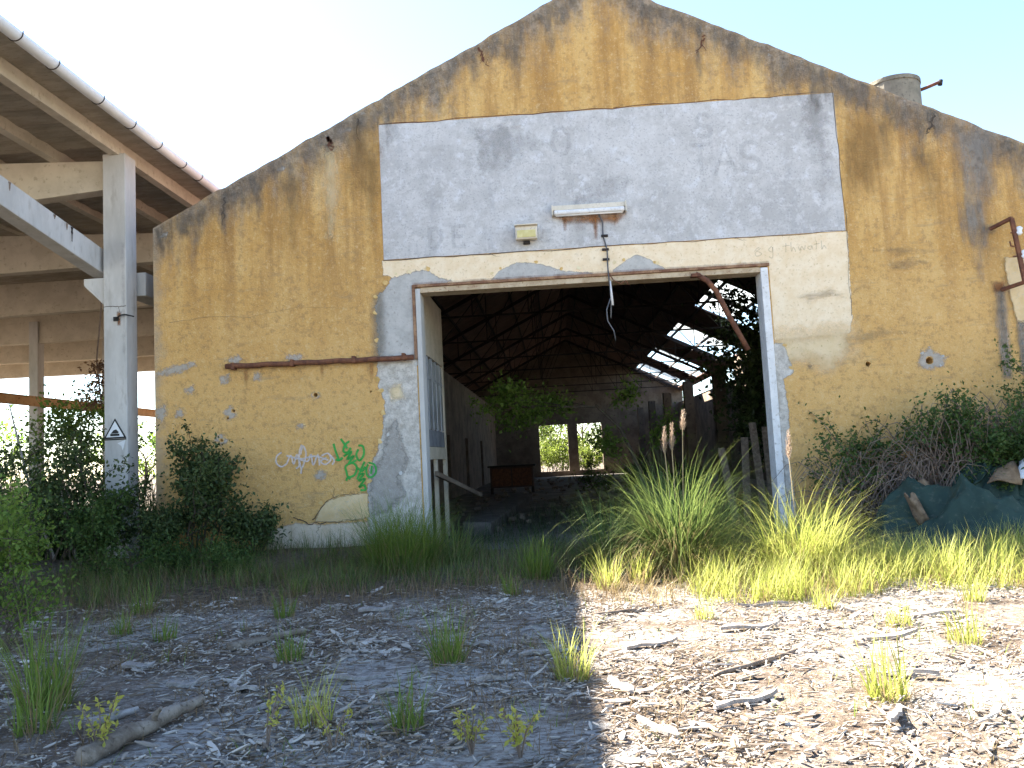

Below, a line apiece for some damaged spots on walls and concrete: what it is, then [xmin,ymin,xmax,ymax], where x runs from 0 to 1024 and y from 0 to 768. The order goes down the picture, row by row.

corrosion [562,215,621,235]
peeling [1005,257,1024,323]
spalling [157,362,195,376]
hole [918,347,945,369]
peeling [269,231,853,550]